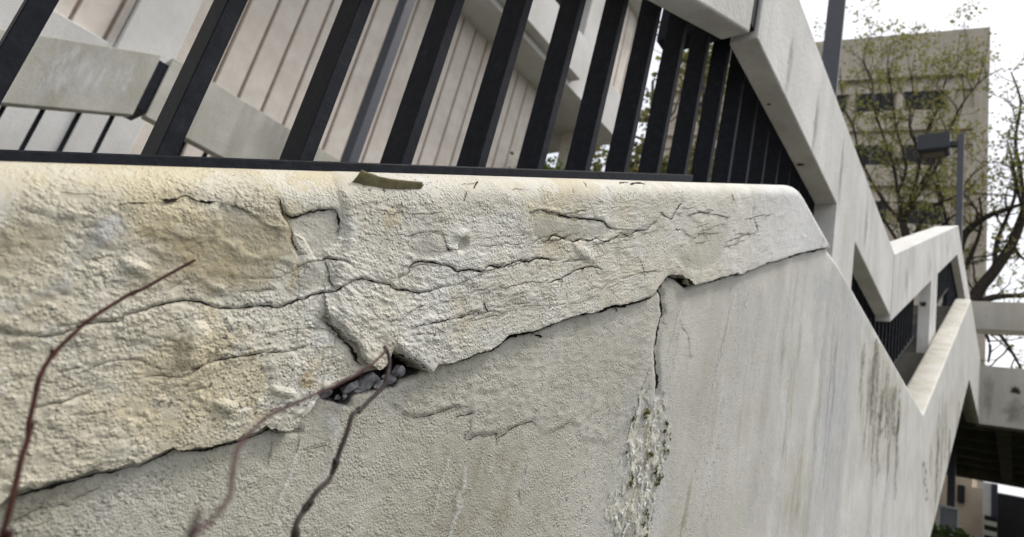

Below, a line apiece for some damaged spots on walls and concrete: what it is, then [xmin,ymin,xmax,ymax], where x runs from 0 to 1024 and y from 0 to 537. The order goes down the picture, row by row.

crack [3,181,825,416]